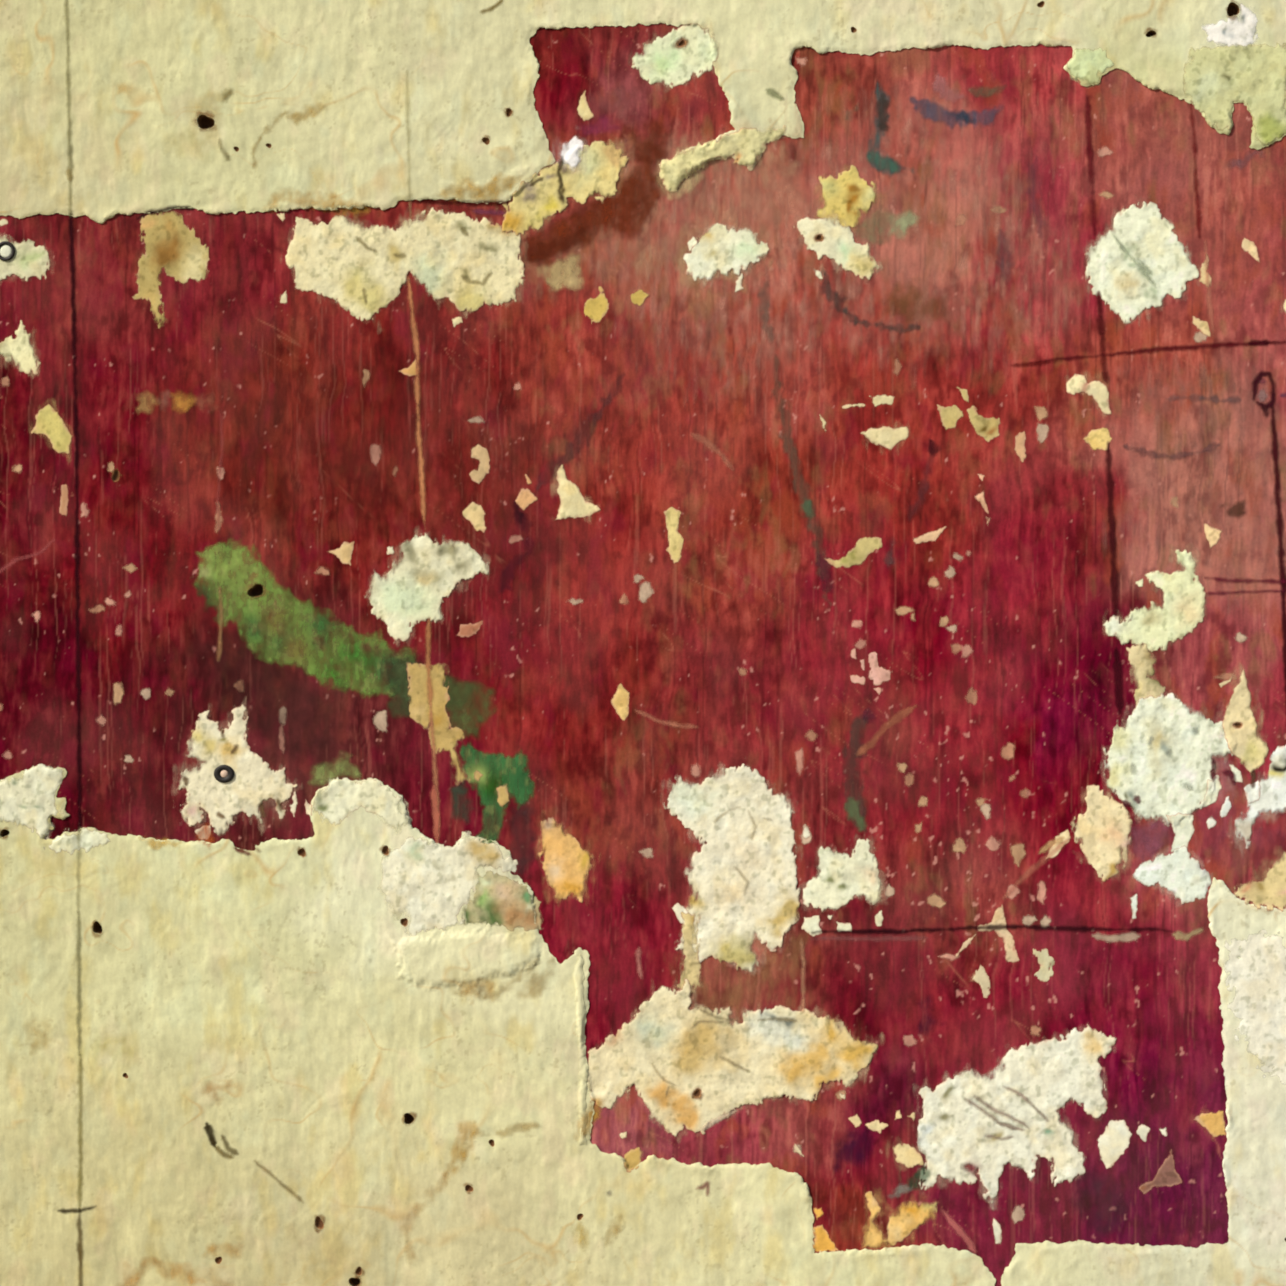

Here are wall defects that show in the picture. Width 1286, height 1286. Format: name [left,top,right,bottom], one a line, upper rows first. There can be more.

peeling [502,23,785,260]
spalling [285,207,525,321]
spalling [1085,201,1199,323]
spalling [369,534,488,641]
spalling [1103,549,1205,652]
spalling [179,704,297,835]
spalling [1103,692,1232,852]
peeling [1222,670,1269,788]
spalling [667,764,800,972]
spalling [803,838,880,912]
spalling [587,979,877,1136]
spalling [917,1024,1116,1199]